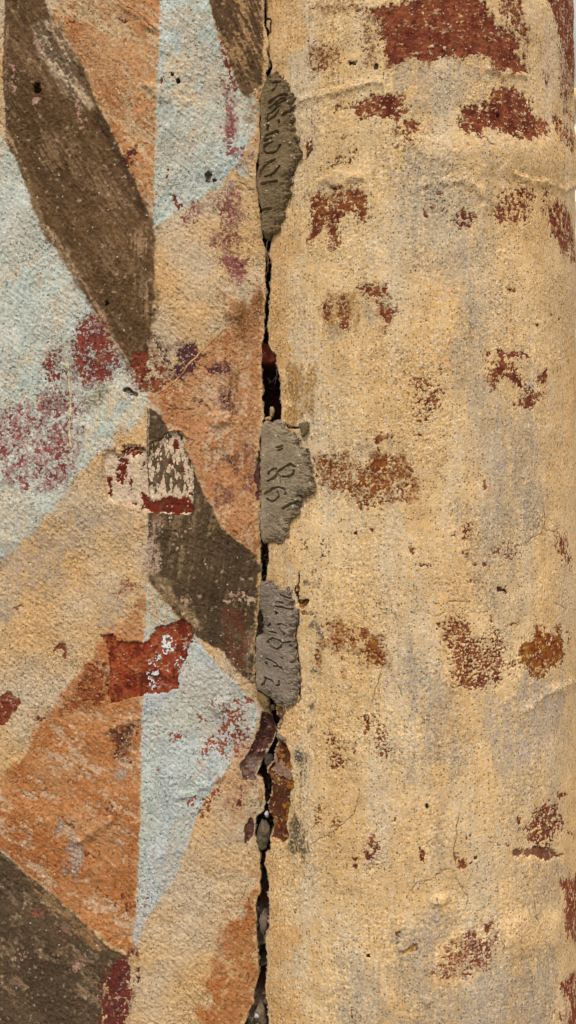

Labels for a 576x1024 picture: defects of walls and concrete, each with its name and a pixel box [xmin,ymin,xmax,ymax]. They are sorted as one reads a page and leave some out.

crack [264,0,272,37]
crack [242,166,300,474]
crack [247,521,269,581]
spalling [195,696,294,843]
crack [245,572,306,1024]